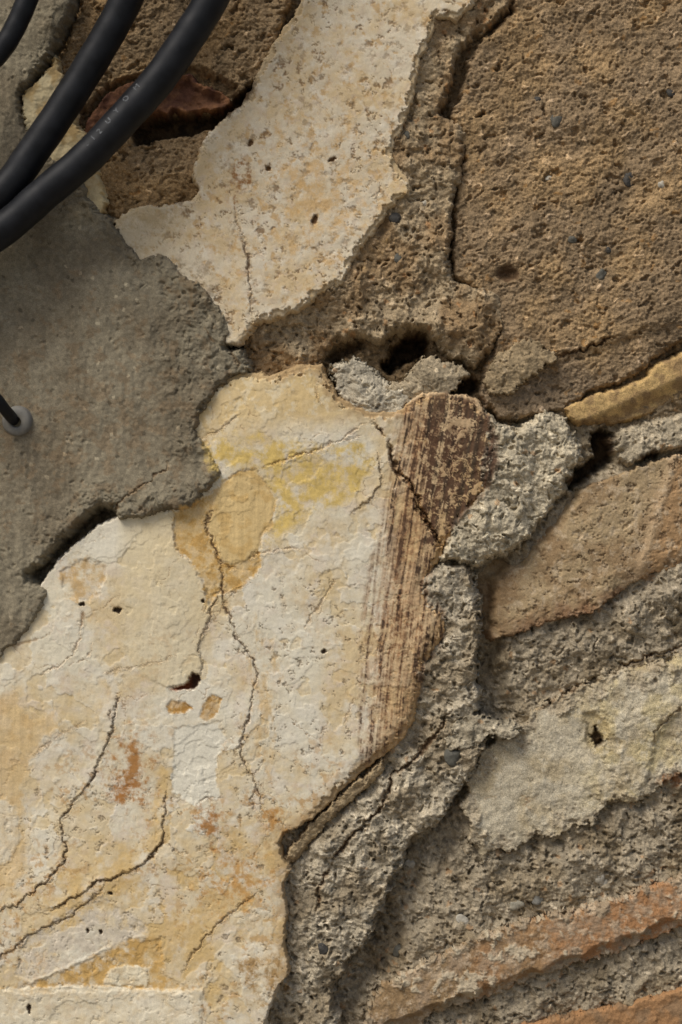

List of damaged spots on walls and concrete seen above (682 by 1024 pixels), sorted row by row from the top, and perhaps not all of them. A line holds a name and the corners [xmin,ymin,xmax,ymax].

spalling [131,77,259,146]
hole [325,341,366,366]
hole [380,331,430,375]
hole [453,374,482,397]
crack [115,460,170,516]
crack [261,423,448,549]
peeling [170,464,280,615]
peeling [56,554,107,607]
crack [304,579,336,632]
crack [0,510,301,972]
spalling [284,757,386,863]
crack [315,709,453,912]